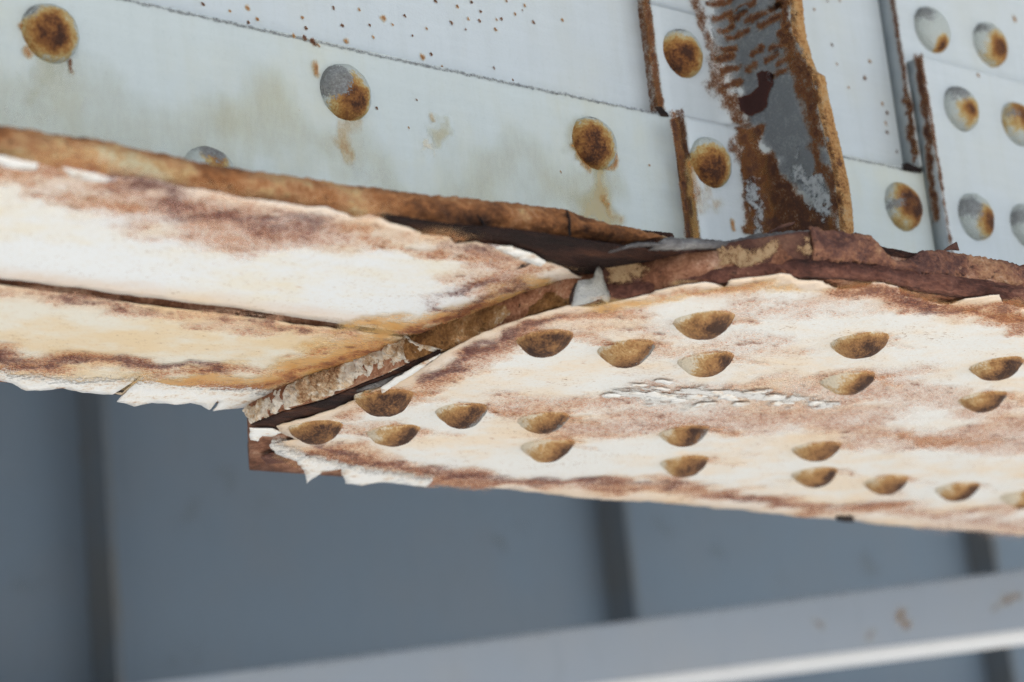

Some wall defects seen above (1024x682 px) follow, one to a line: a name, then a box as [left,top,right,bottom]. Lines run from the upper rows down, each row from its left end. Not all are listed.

peeling [0,156,38,170]
peeling [63,167,118,183]
rust [637,0,701,239]
rust [691,0,854,269]
rust [890,0,959,253]
spalling [376,212,680,307]
rust [0,143,1024,455]
crack [569,283,577,305]
peeling [0,368,273,411]
peeling [381,354,440,393]
peeling [600,380,841,413]
peeling [249,427,436,487]